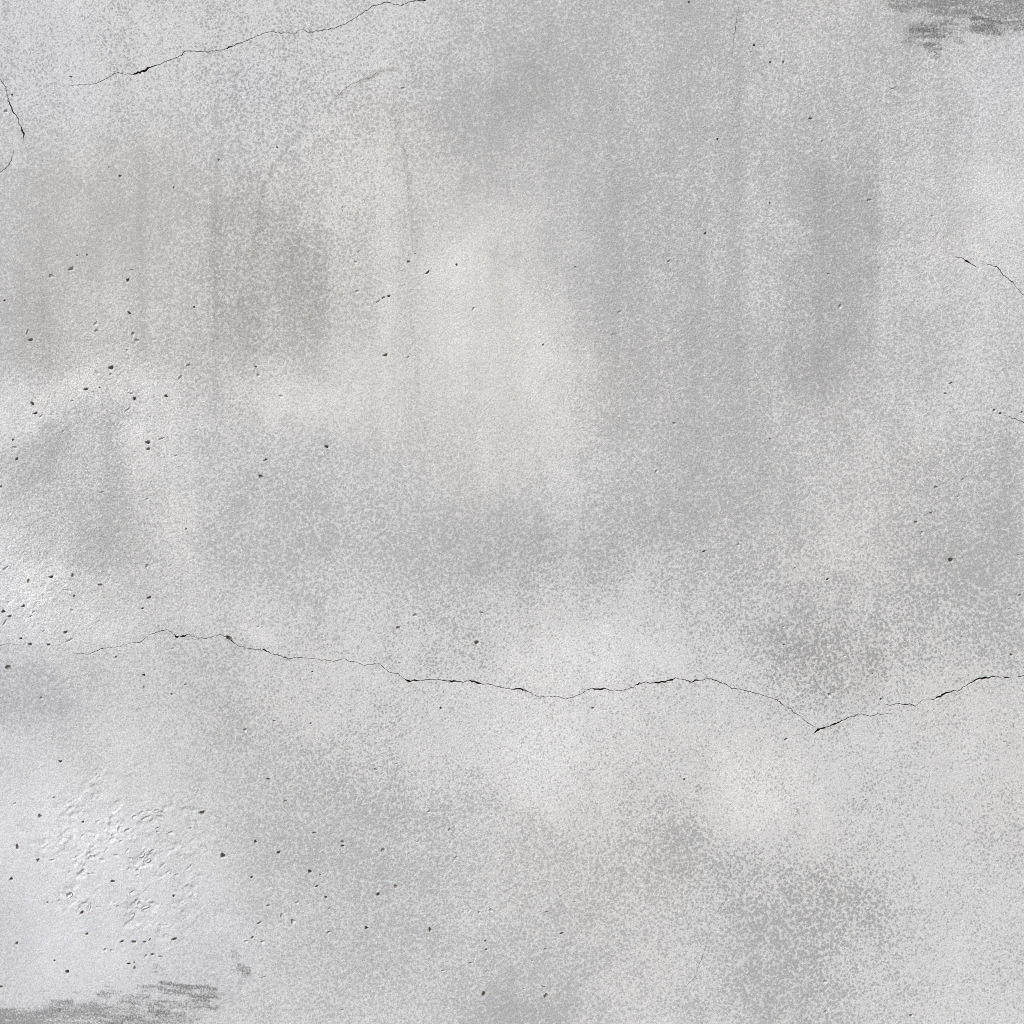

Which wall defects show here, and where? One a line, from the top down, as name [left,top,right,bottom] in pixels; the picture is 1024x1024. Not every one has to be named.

crack [50,0,426,95]
crack [0,79,25,172]
crack [939,256,1023,295]
crack [55,629,1024,736]